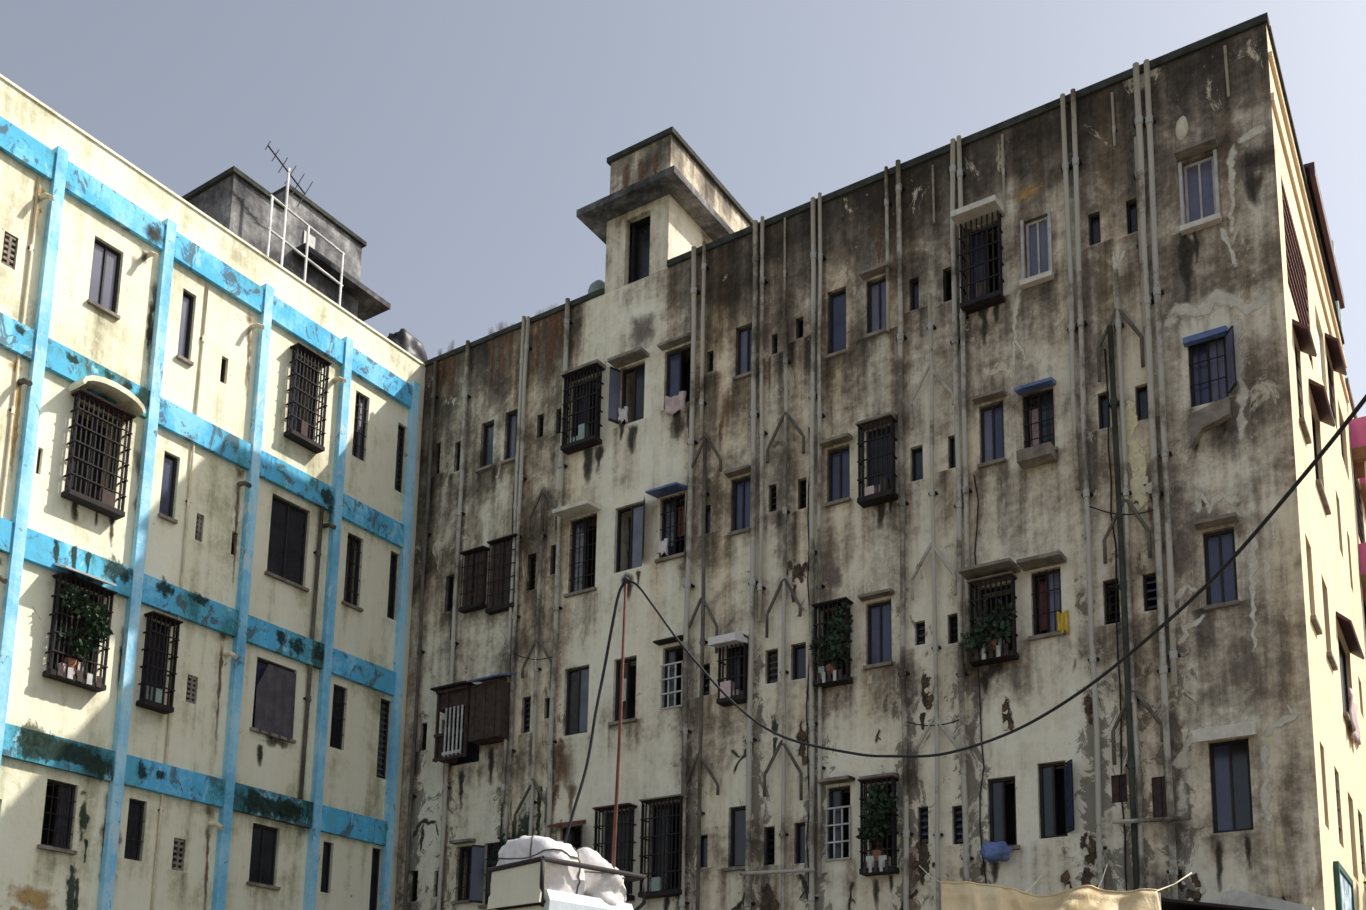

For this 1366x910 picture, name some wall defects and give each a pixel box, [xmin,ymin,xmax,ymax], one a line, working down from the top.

damp [1240,151,1268,203]
damp [1173,536,1188,573]
flaking render [1002,696,1014,731]
damp [73,810,121,910]
flaking render [1060,832,1104,891]
flaking render [1177,873,1205,902]